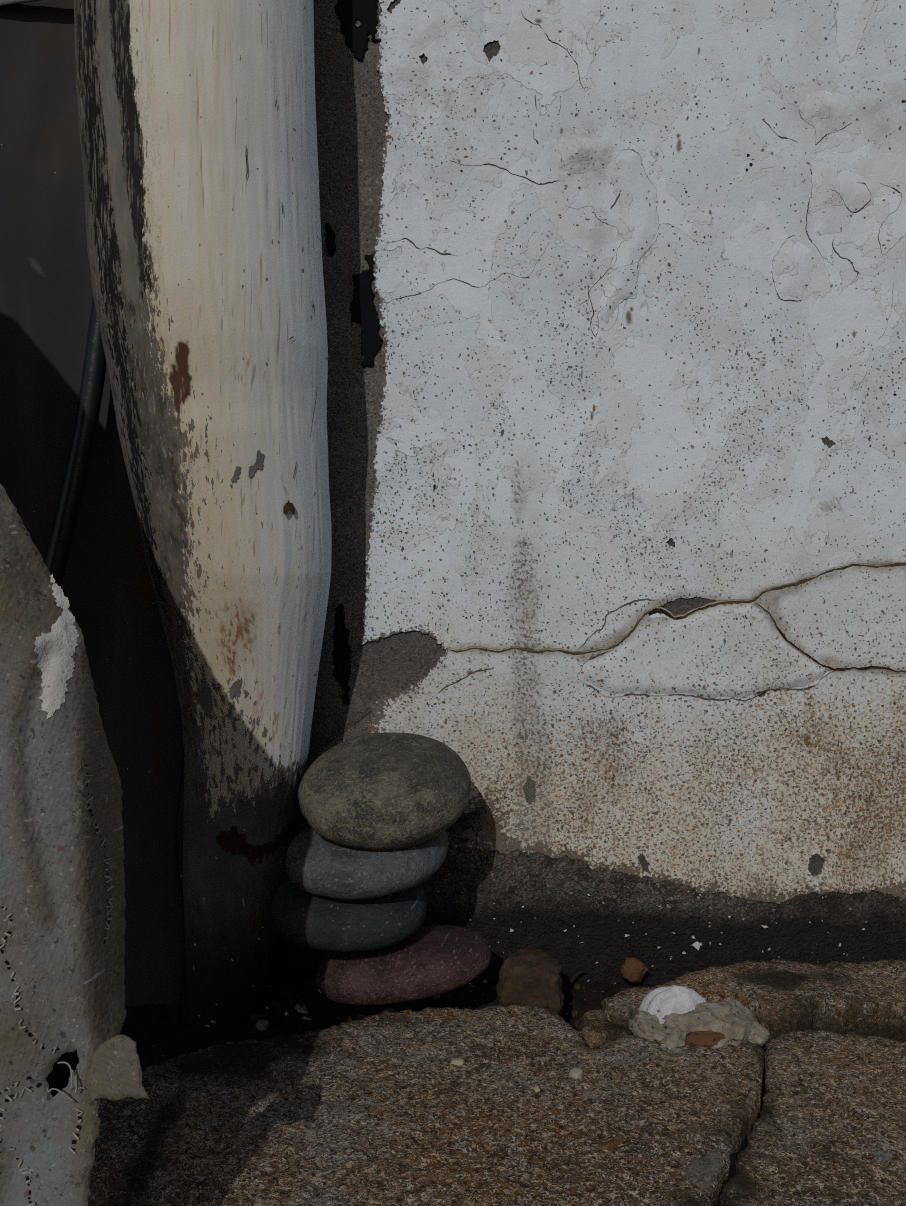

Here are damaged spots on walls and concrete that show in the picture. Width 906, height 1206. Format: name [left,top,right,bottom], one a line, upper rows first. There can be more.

crack [522,14,584,144]
crack [381,238,549,316]
crack [450,160,560,185]
crack [574,149,659,337]
crack [766,110,902,301]
peeling [307,0,446,760]
crack [440,561,906,701]
rust [216,801,301,866]